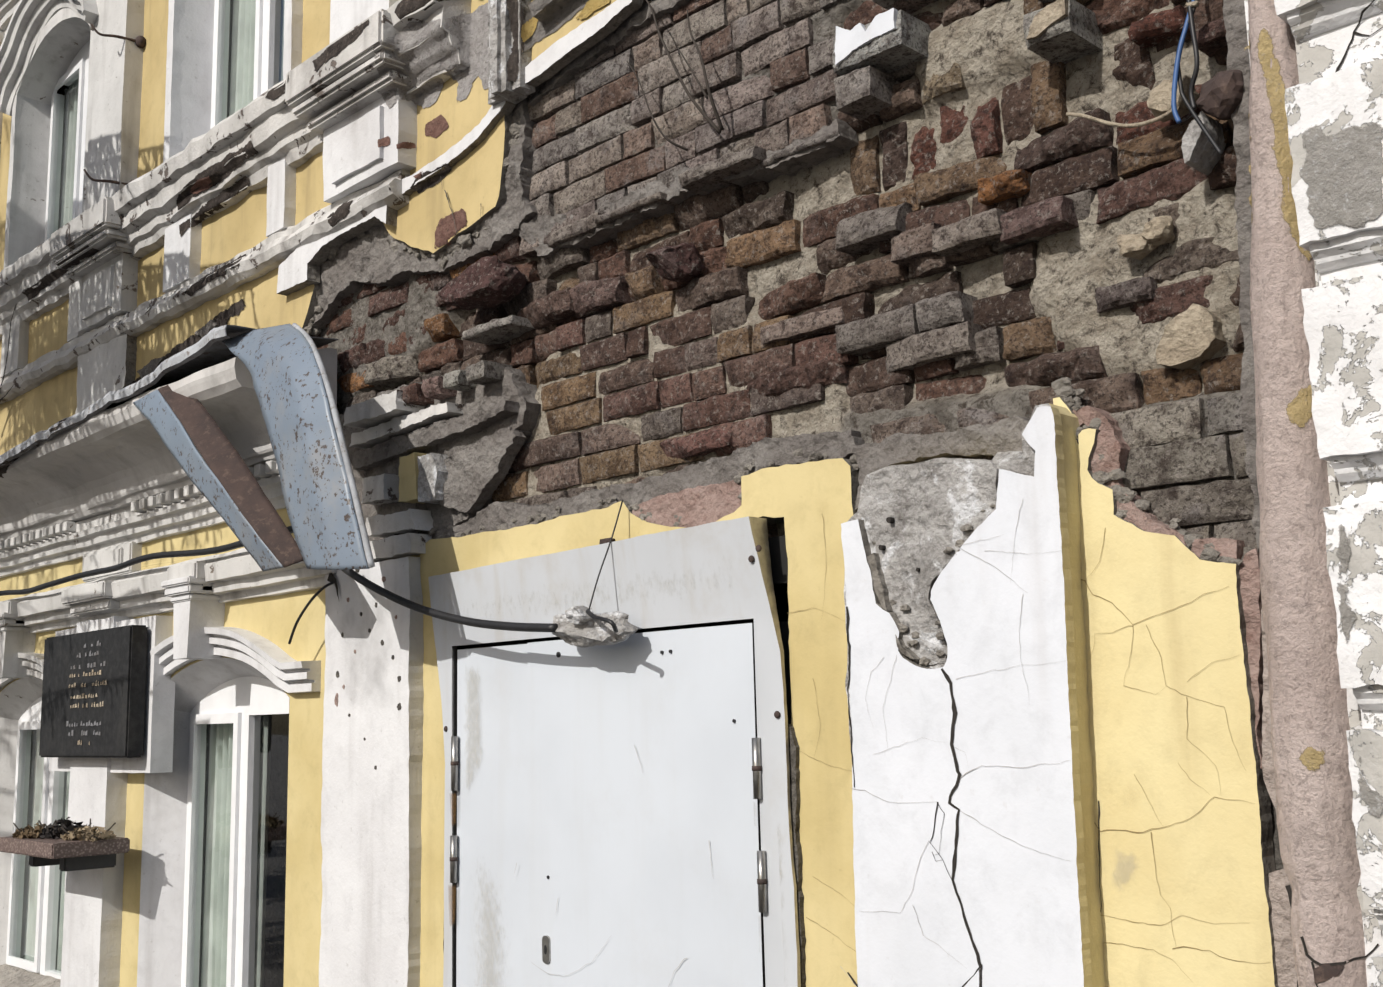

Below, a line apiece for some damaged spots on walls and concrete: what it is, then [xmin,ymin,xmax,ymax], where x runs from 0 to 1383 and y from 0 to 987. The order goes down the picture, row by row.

peeling [121,299,246,389]
spalling [304,0,1383,987]
crack [790,500,1269,987]
crack [1285,885,1379,987]